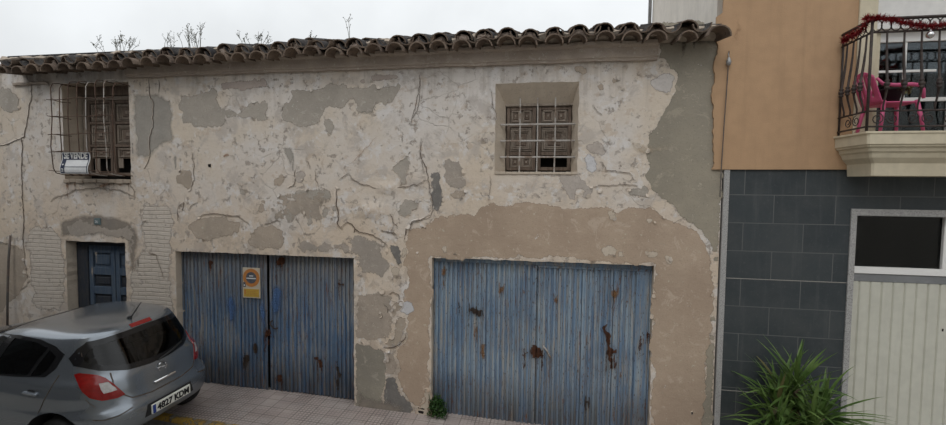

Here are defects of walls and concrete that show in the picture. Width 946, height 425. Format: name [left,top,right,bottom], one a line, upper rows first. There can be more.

crack [0,75,32,290]
crack [50,78,160,202]
flaking render [130,202,174,313]
peeling [176,169,194,190]
peeling [188,217,240,241]
peeling [179,78,269,128]
peeling [248,171,337,250]
crack [282,75,433,247]
flaking render [280,41,724,425]
corrosion [458,303,486,368]
corrosion [522,345,545,371]
corrosion [602,324,622,388]